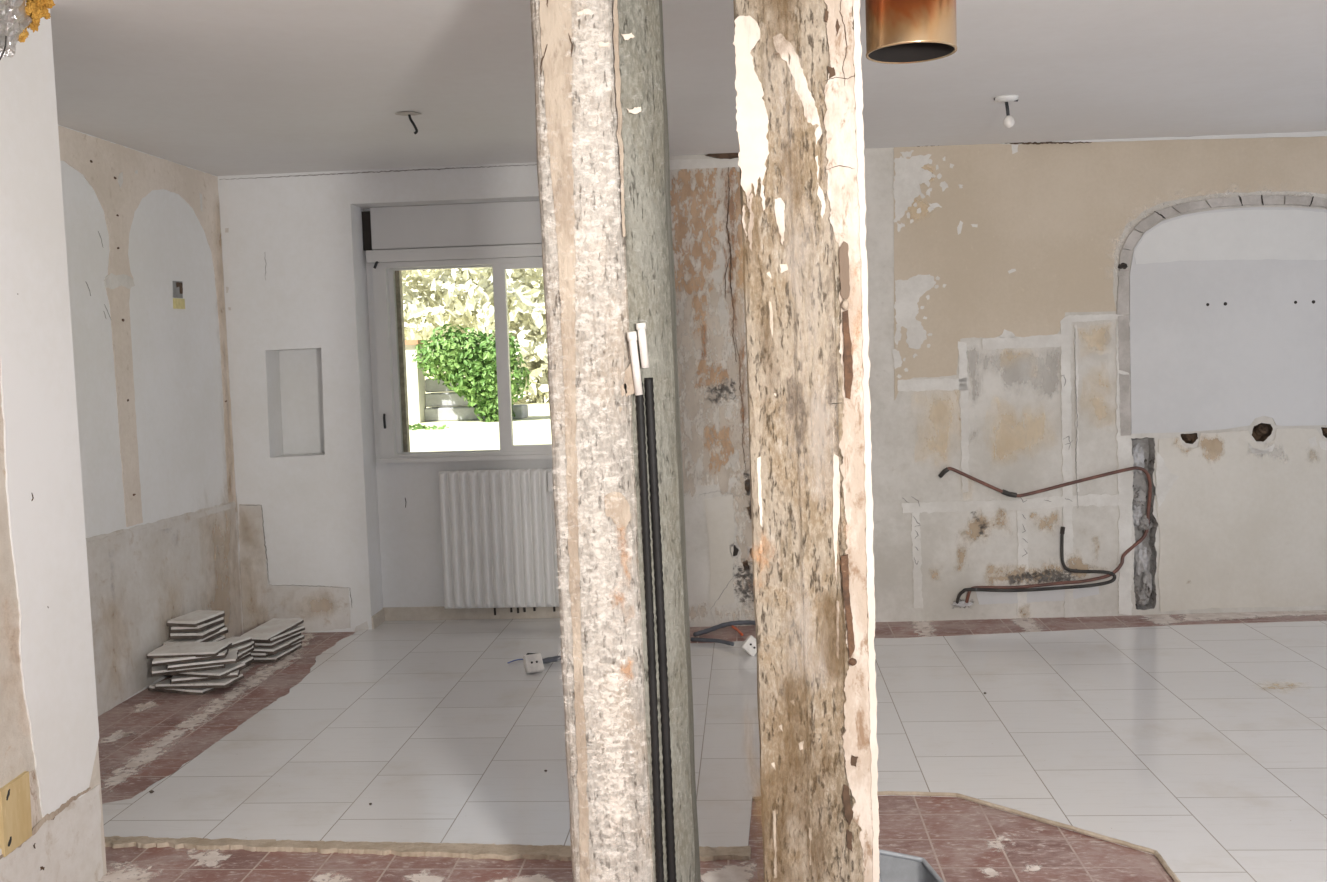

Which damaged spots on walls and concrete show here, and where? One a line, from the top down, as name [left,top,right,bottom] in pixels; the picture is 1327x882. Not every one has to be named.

peeling [893,150,963,232]
peeling [892,274,947,378]
leakage [733,559,754,608]